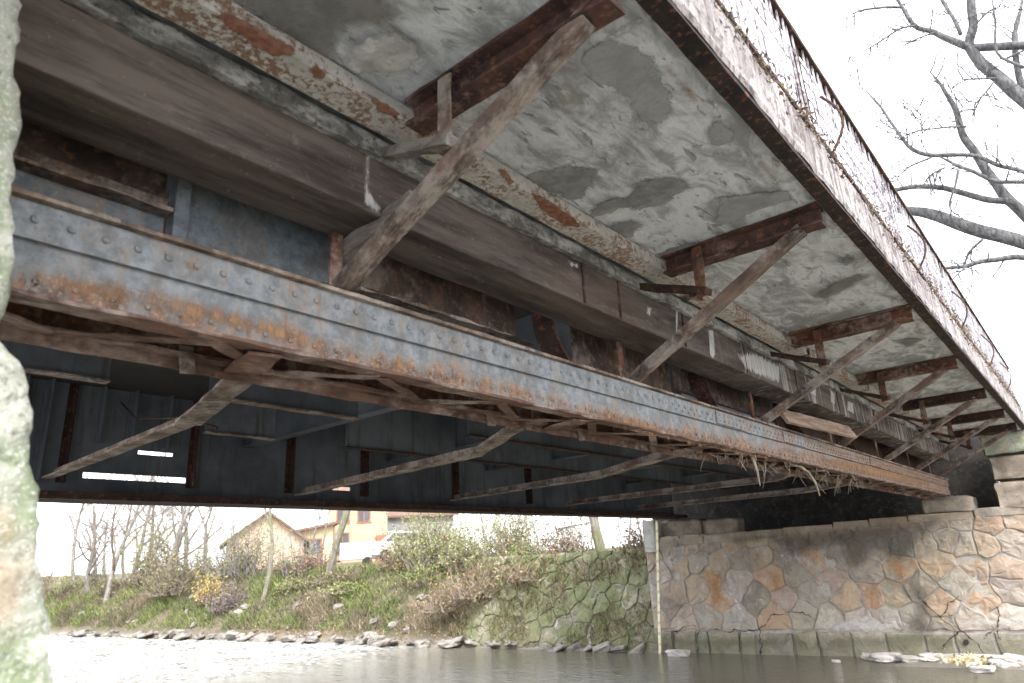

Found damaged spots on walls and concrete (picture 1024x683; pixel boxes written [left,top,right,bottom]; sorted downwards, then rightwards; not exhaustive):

peeling [212,13,295,57]
peeling [310,64,326,79]
peeling [347,33,417,75]
peeling [363,91,400,120]
corrosion [67,281,320,347]
crack [918,592,1001,654]